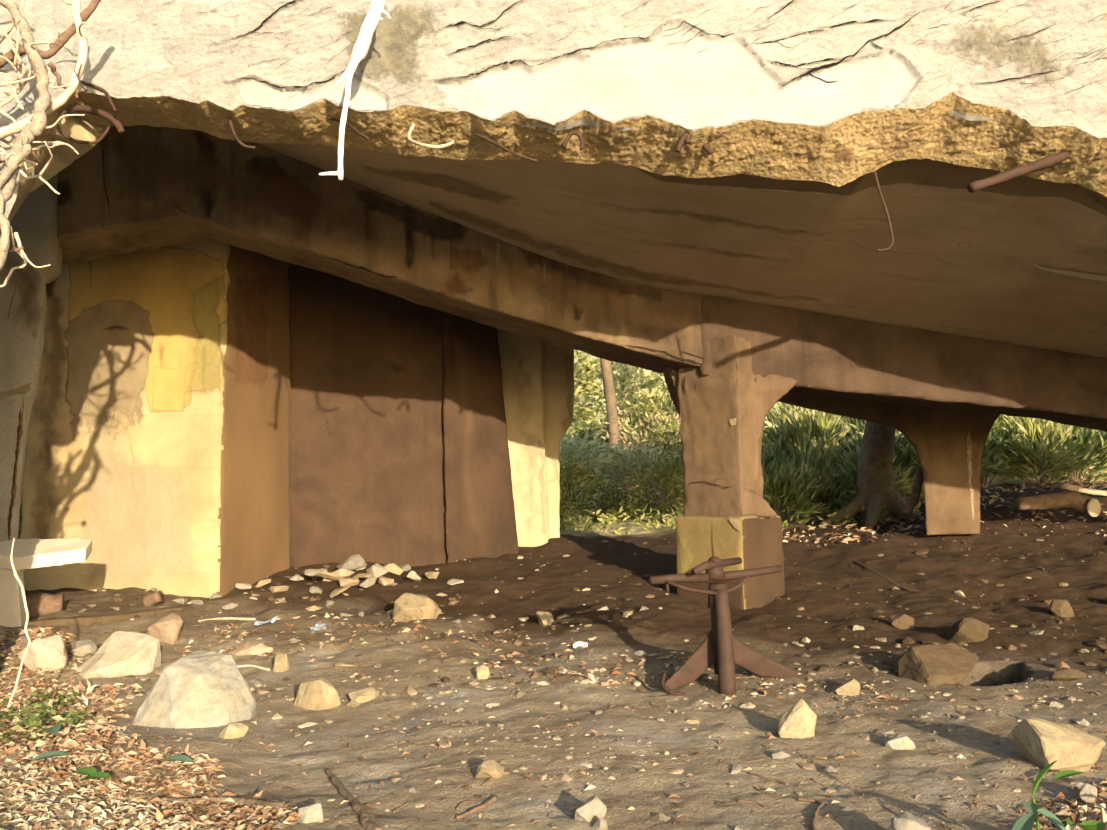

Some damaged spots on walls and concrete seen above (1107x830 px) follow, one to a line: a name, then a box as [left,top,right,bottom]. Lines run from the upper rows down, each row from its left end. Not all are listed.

crack [140,0,366,73]
crack [436,0,522,54]
crack [664,6,717,52]
crack [746,0,1107,91]
spalling [8,19,1107,252]
leakage [18,247,226,471]
leakage [36,496,55,539]